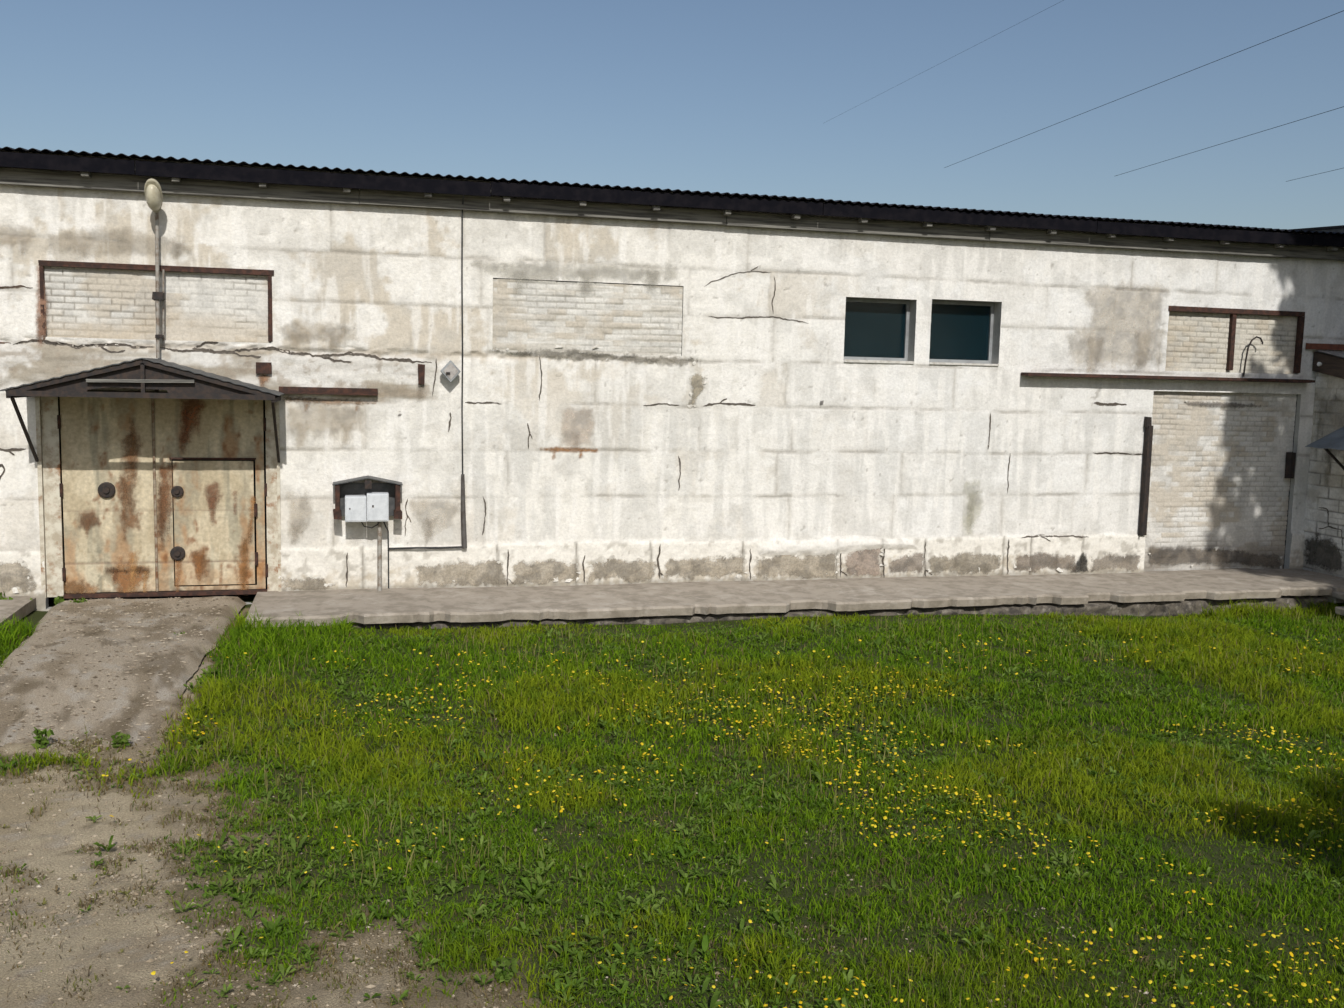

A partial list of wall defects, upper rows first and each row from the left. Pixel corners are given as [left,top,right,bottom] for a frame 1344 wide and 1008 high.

crack [0,283,33,291]
crack [704,267,809,324]
crack [0,333,500,432]
crack [527,355,542,449]
rust [80,512,99,530]
rust [107,553,148,593]
rust [121,421,140,539]
rust [157,465,174,540]
rust [175,550,222,592]
rust [206,483,219,520]
rust [234,497,255,590]
water stain [1073,553,1088,572]